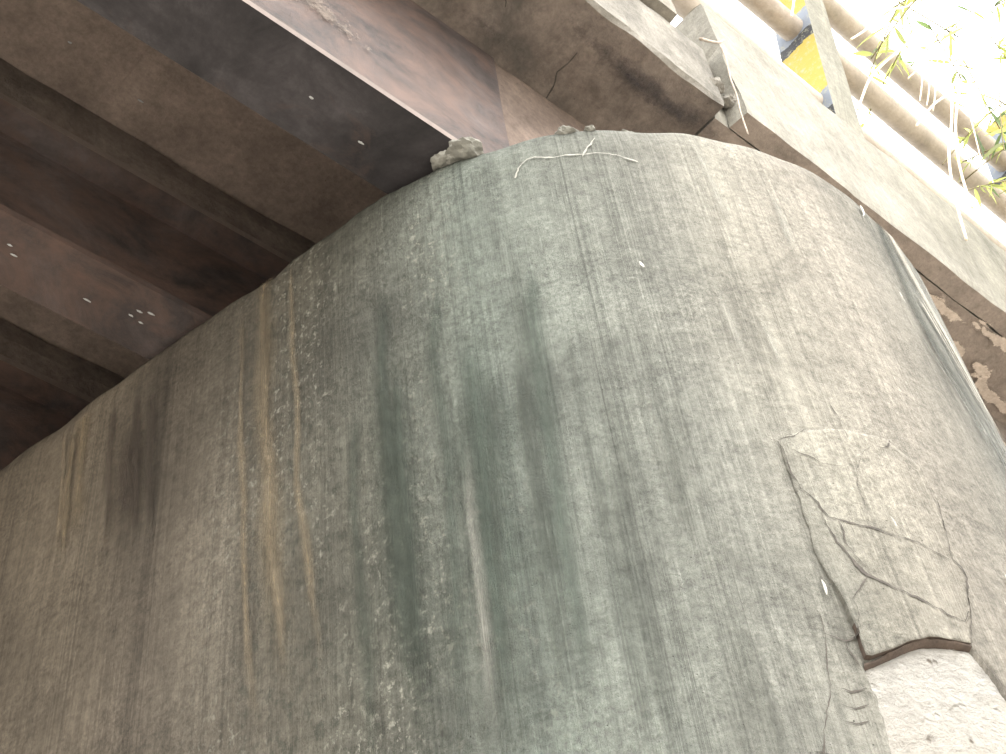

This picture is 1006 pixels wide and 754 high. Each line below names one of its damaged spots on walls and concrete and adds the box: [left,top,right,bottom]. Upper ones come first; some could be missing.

peeling [929,293,1006,352]
peeling [970,362,1006,415]
crack [778,402,1006,754]
spalling [864,639,1006,754]